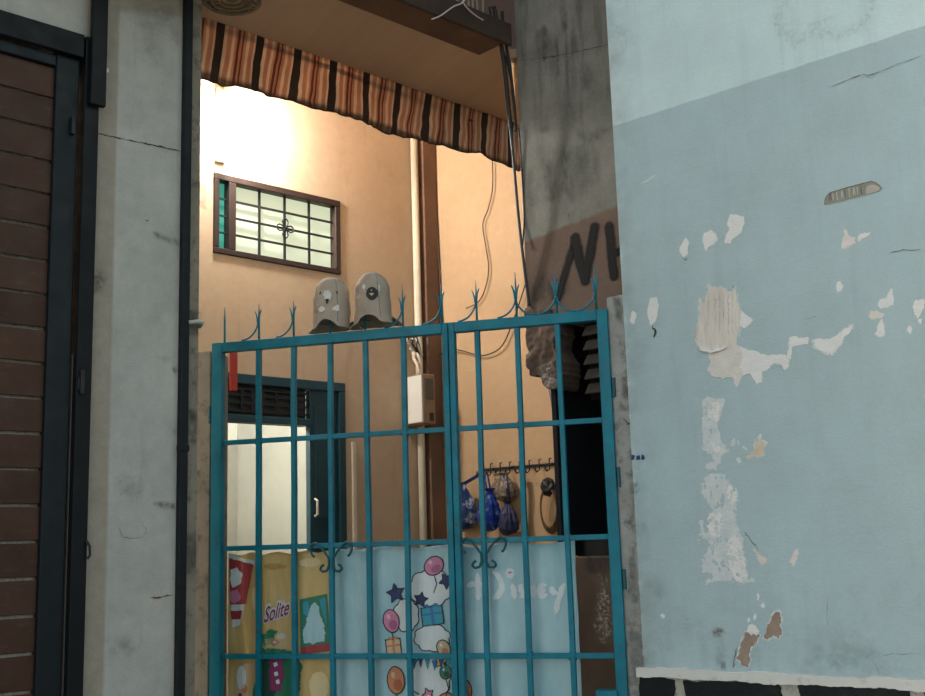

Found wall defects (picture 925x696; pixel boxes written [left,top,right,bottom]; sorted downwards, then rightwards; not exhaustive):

crack [830,56,920,87]
crack [98,133,181,152]
peeling [679,238,689,260]
peeling [702,214,745,251]
peeling [841,229,870,249]
peeling [694,281,854,388]
peeling [868,288,894,337]
peeling [907,299,925,334]
peeling [697,396,768,585]
spalling [733,593,784,668]